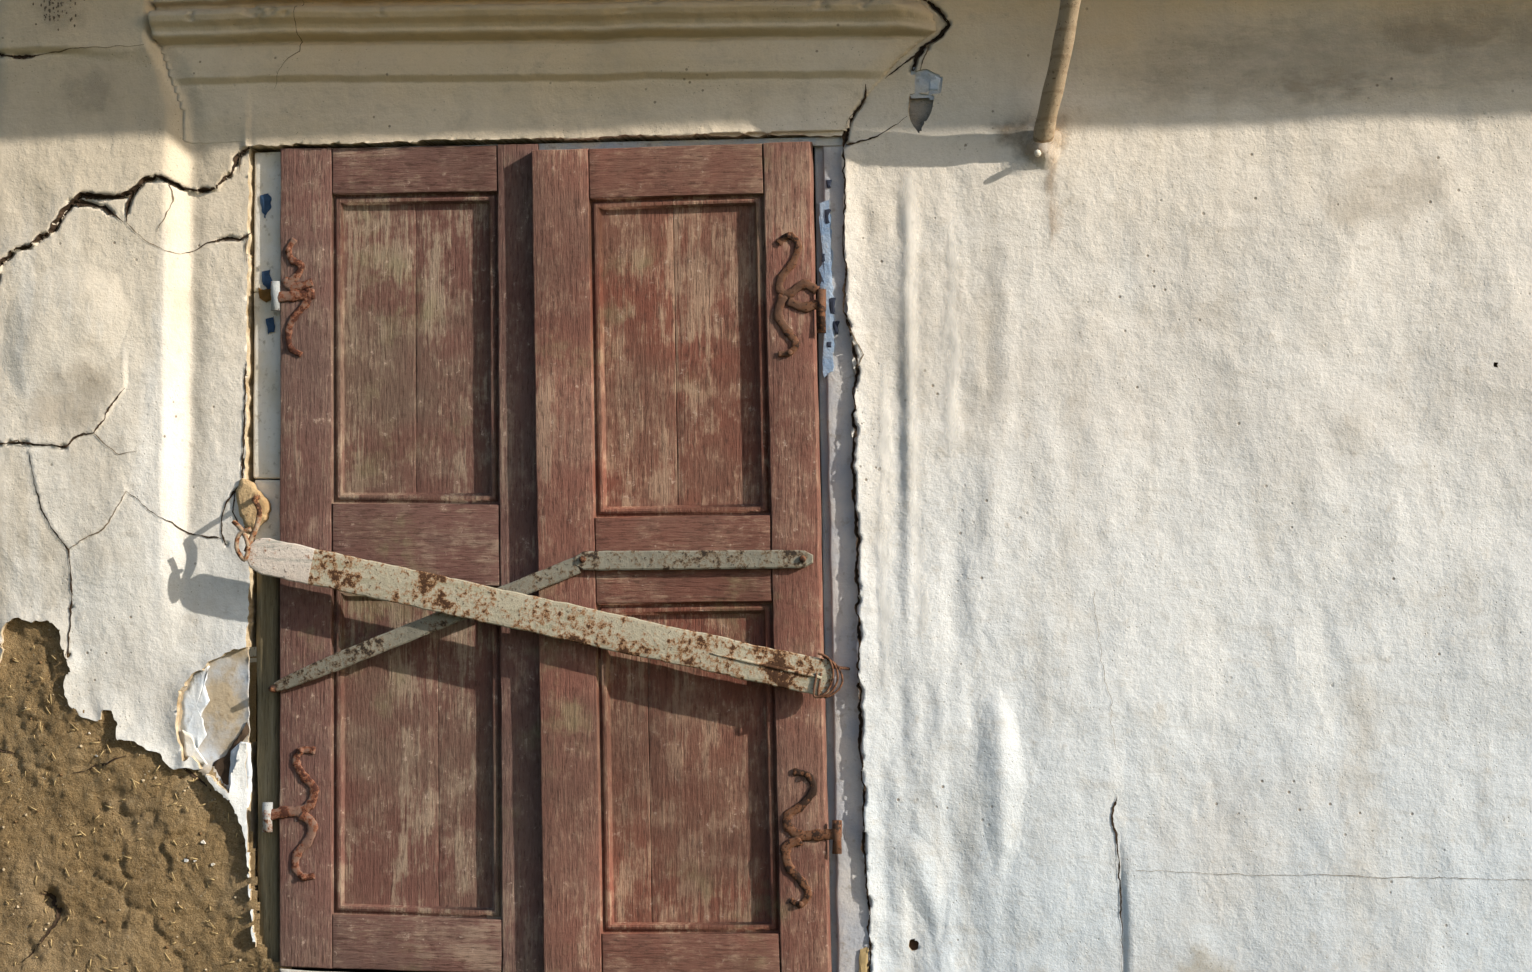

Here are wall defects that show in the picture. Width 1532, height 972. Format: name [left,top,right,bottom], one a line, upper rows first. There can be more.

crack [0,147,252,266]
crack [0,364,247,657]
spalling [0,618,292,972]
crack [1111,798,1269,968]